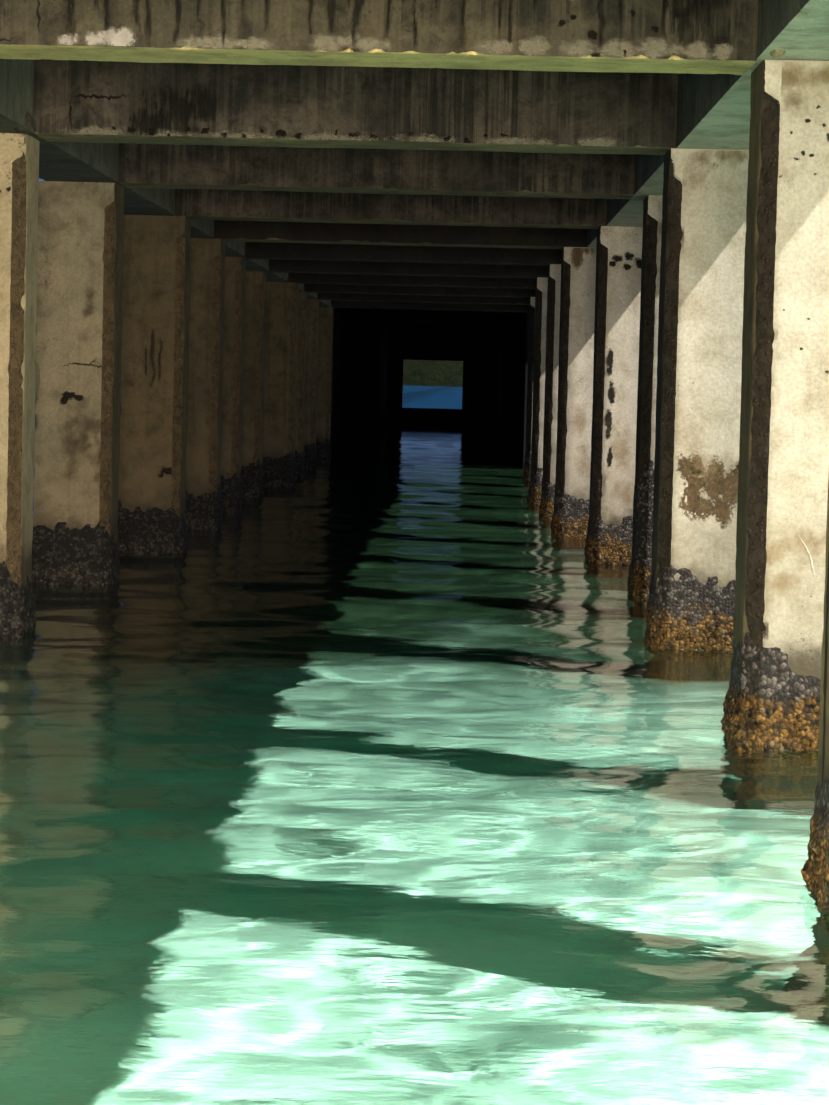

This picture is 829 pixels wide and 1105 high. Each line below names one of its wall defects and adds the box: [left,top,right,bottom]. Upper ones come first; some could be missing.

spalling [677,452,739,529]